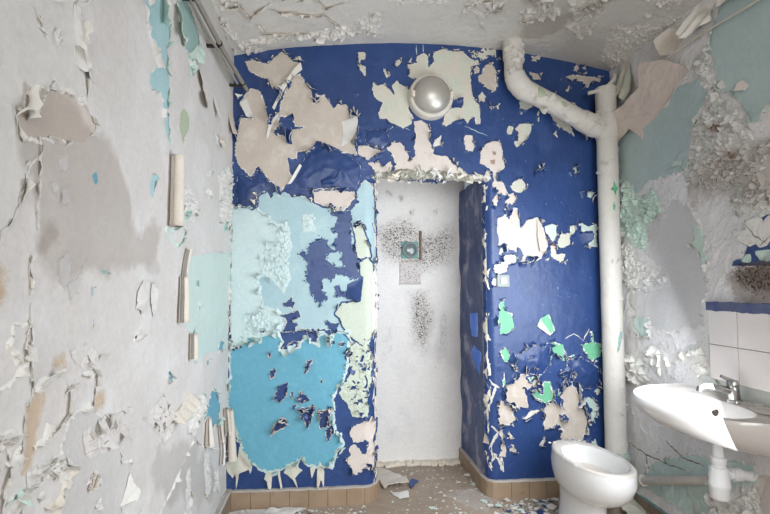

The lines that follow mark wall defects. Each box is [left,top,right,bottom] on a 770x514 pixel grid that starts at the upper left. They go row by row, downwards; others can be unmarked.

peeling [0,0,102,259]
peeling [138,0,685,514]
water stain [376,212,457,273]
water stain [410,289,447,360]
peeling [611,0,770,388]
water stain [733,262,770,298]
peeling [0,318,39,456]
peeling [5,394,179,514]
peeling [641,452,770,514]